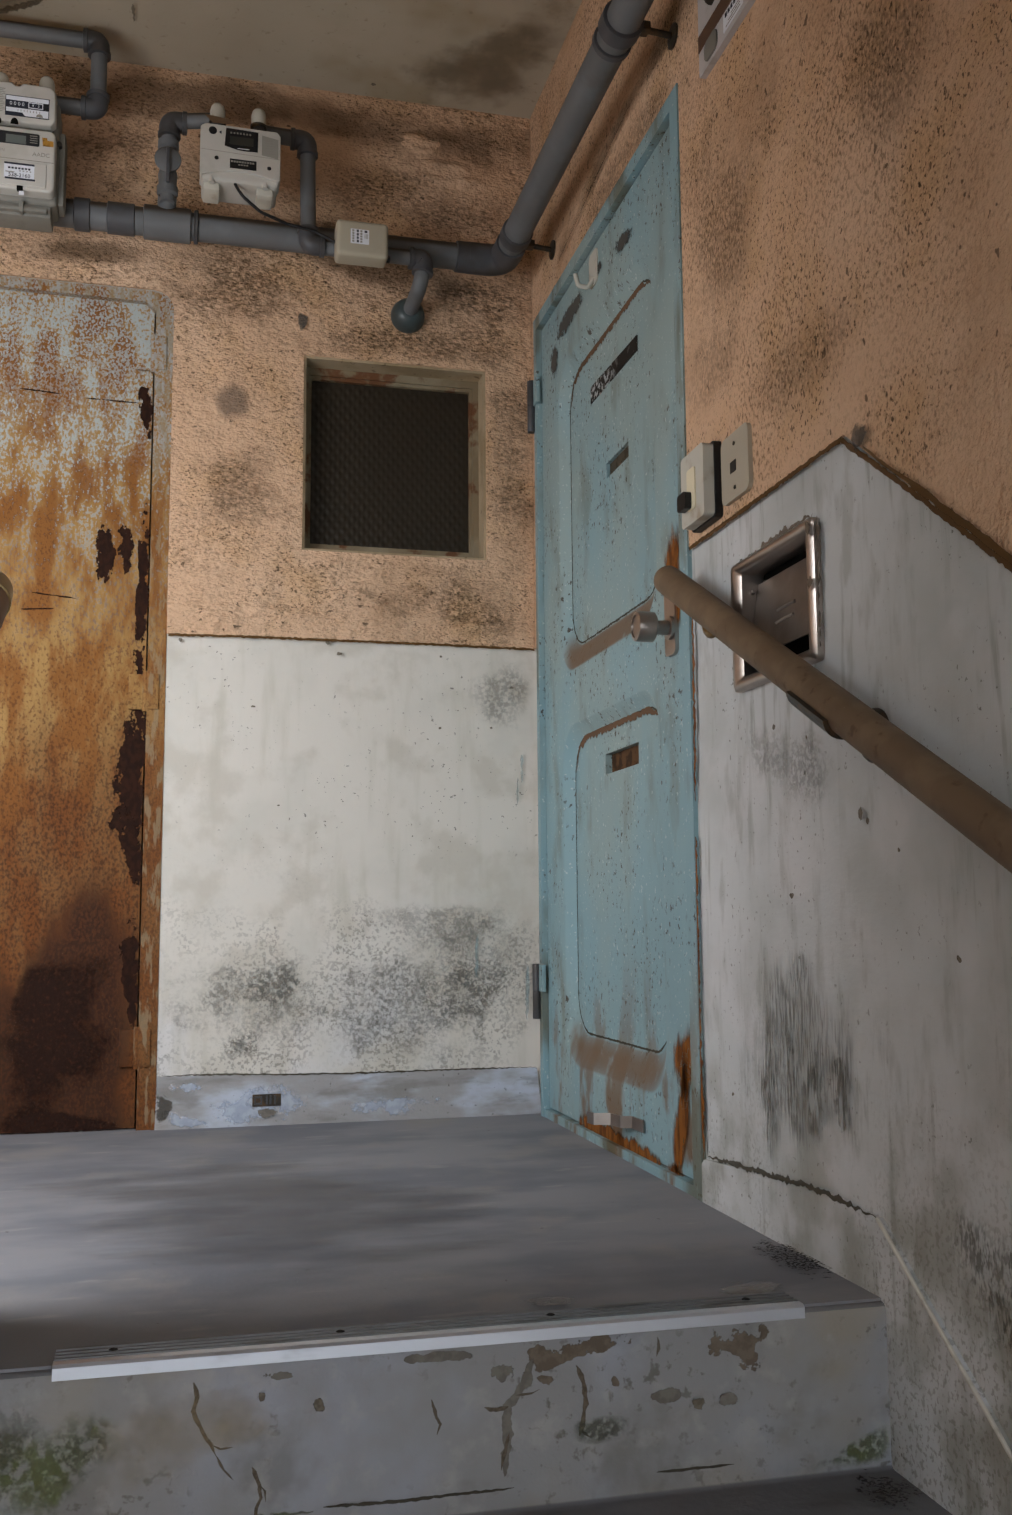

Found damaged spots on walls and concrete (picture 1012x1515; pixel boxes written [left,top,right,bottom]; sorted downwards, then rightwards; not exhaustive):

corrosion [138,386,154,439]
corrosion [95,503,150,674]
corrosion [108,710,146,885]
corrosion [579,837,705,1176]
corrosion [3,1111,114,1134]
leakage [961,1225,1012,1331]
peeling [404,1351,472,1364]
peeling [491,1334,631,1385]
peeling [708,1324,769,1371]
peeling [259,1372,292,1402]
peeling [651,1387,738,1410]
crack [191,1383,266,1515]